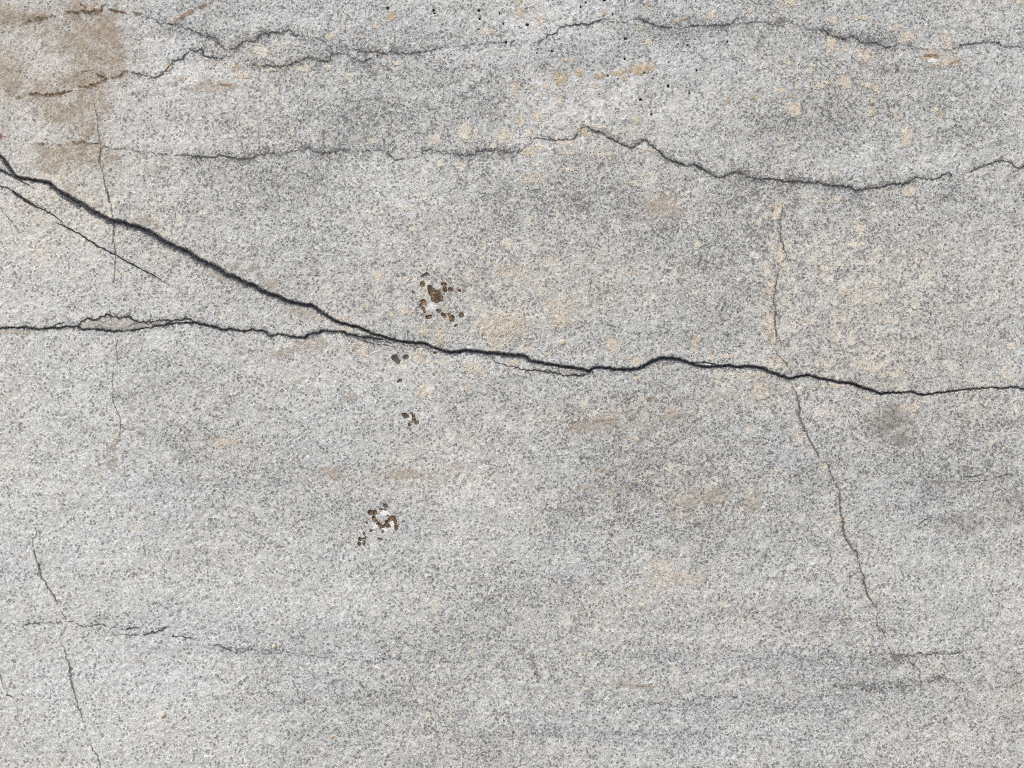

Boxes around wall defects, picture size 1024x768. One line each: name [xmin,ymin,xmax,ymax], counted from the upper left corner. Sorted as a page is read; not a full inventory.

crack [131,15,1024,78]
crack [0,100,1024,696]